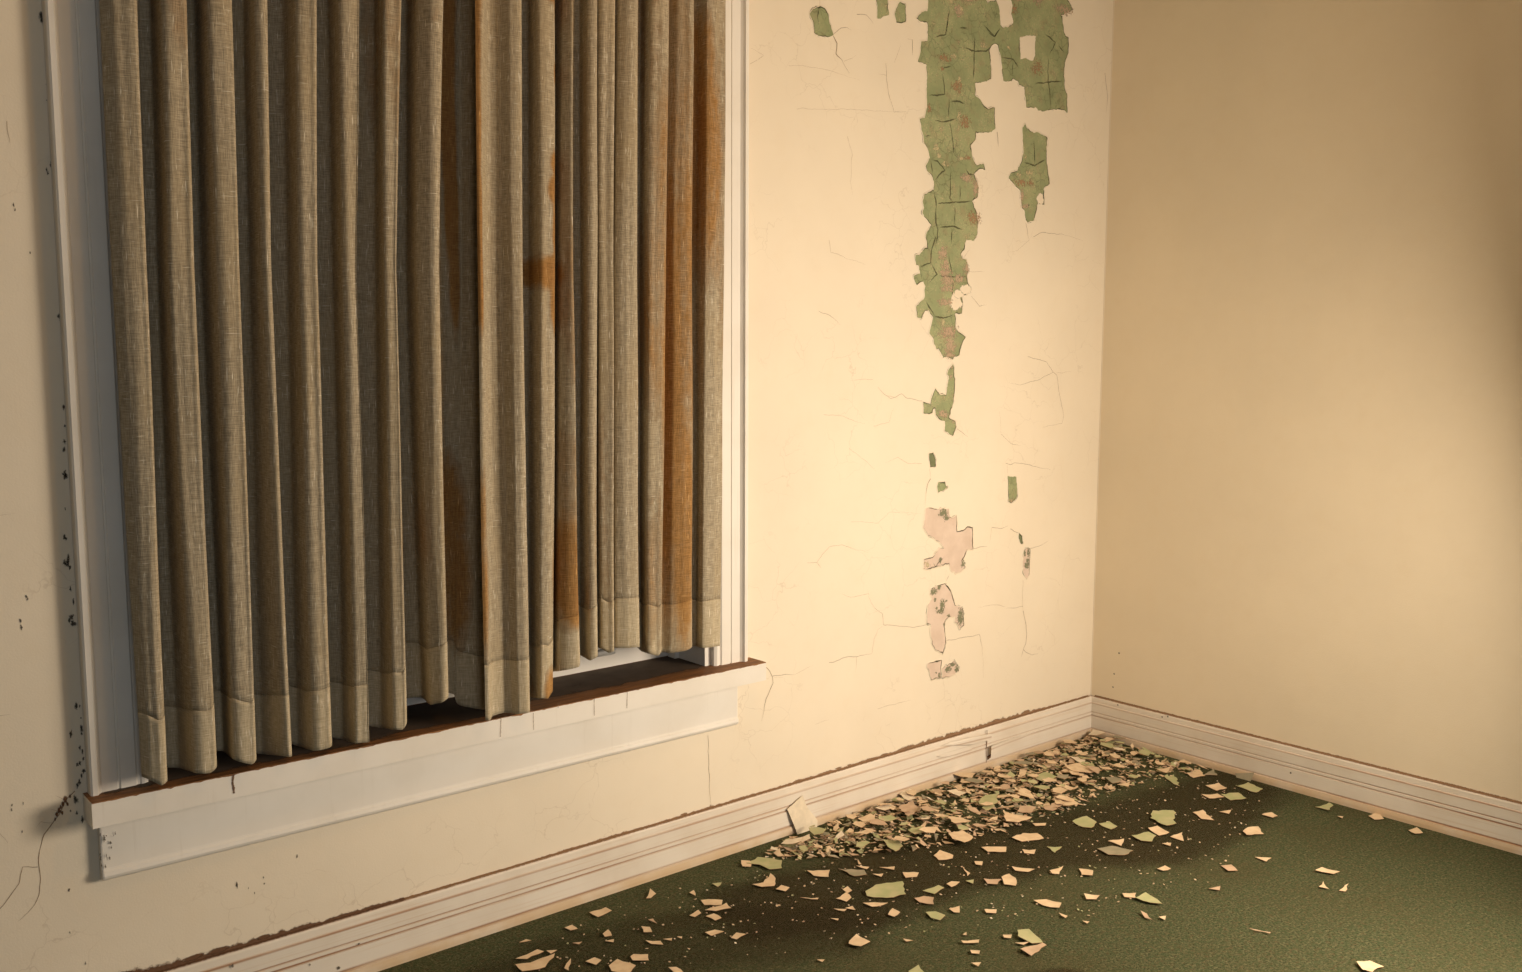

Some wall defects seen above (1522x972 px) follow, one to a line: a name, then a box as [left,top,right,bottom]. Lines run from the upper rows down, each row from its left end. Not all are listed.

peeling [809,5,834,39]
peeling [875,0,1074,437]
peeling [922,452,974,681]
crack [0,791,75,920]